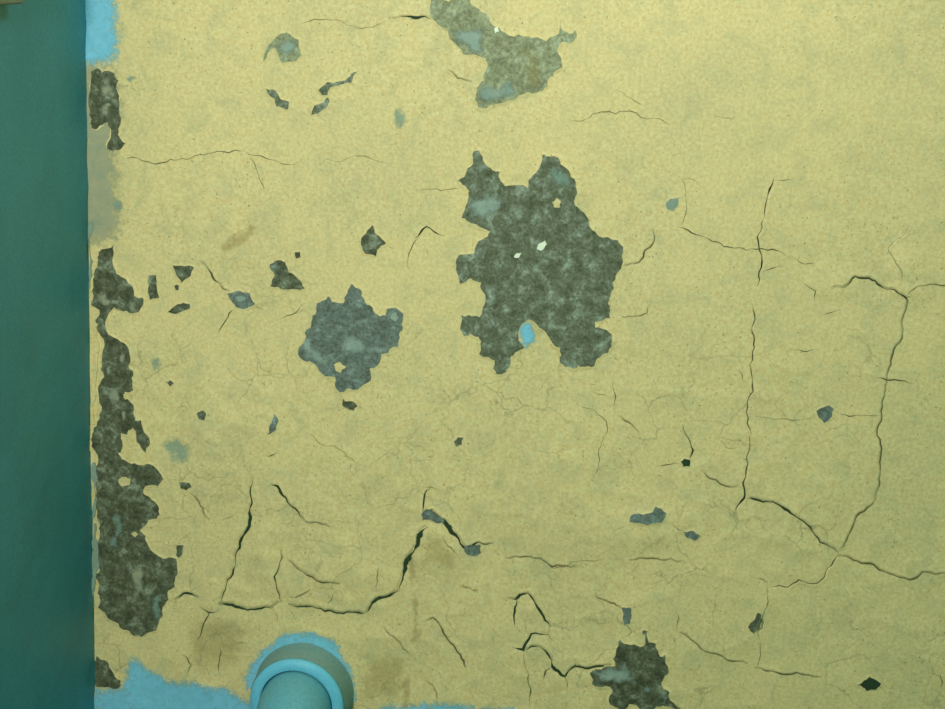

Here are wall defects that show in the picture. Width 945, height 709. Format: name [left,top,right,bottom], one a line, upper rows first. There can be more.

peeling [87,66,129,153]
peeling [427,0,578,113]
crack [127,150,295,187]
peeling [452,147,628,377]
crack [624,227,655,266]
peeling [294,281,407,411]
peeling [89,243,184,638]
crack [661,178,945,678]
crack [171,474,598,674]
crack [629,554,685,562]
crack [508,588,611,703]
flaking render [588,606,679,709]